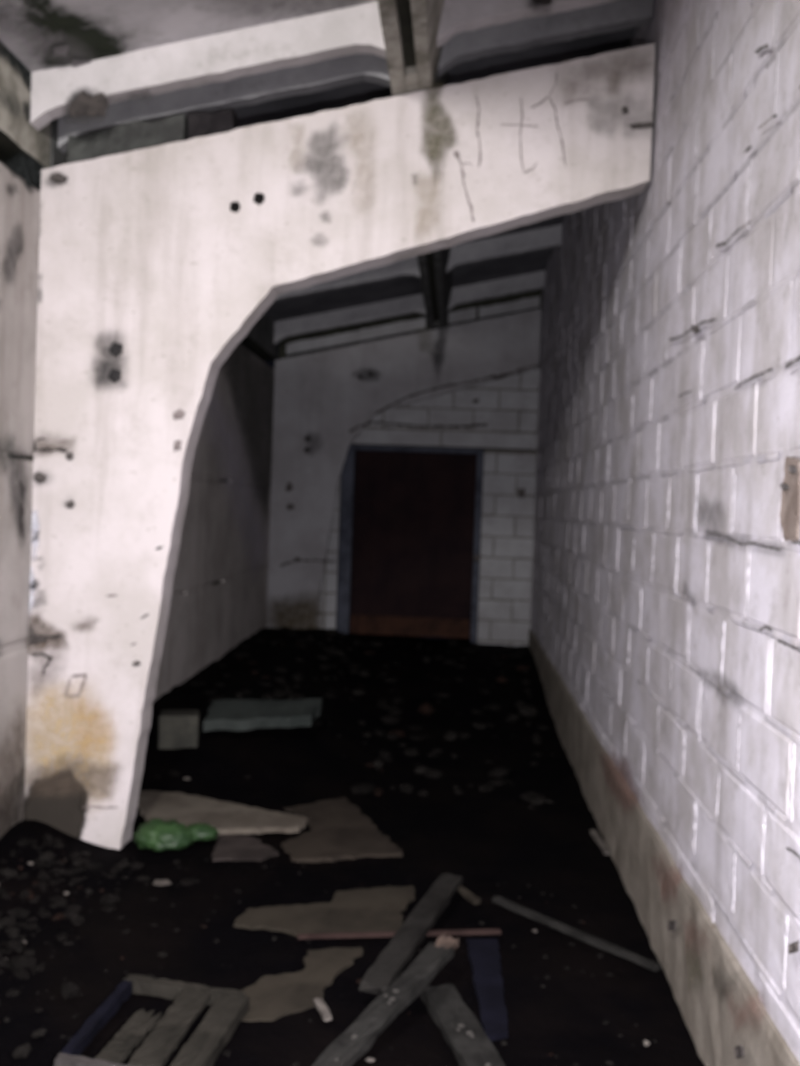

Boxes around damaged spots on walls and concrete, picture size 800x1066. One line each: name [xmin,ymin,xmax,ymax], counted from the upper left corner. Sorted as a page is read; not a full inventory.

leakage [0,0,125,120]
leakage [425,86,454,164]
crack [708,532,800,551]